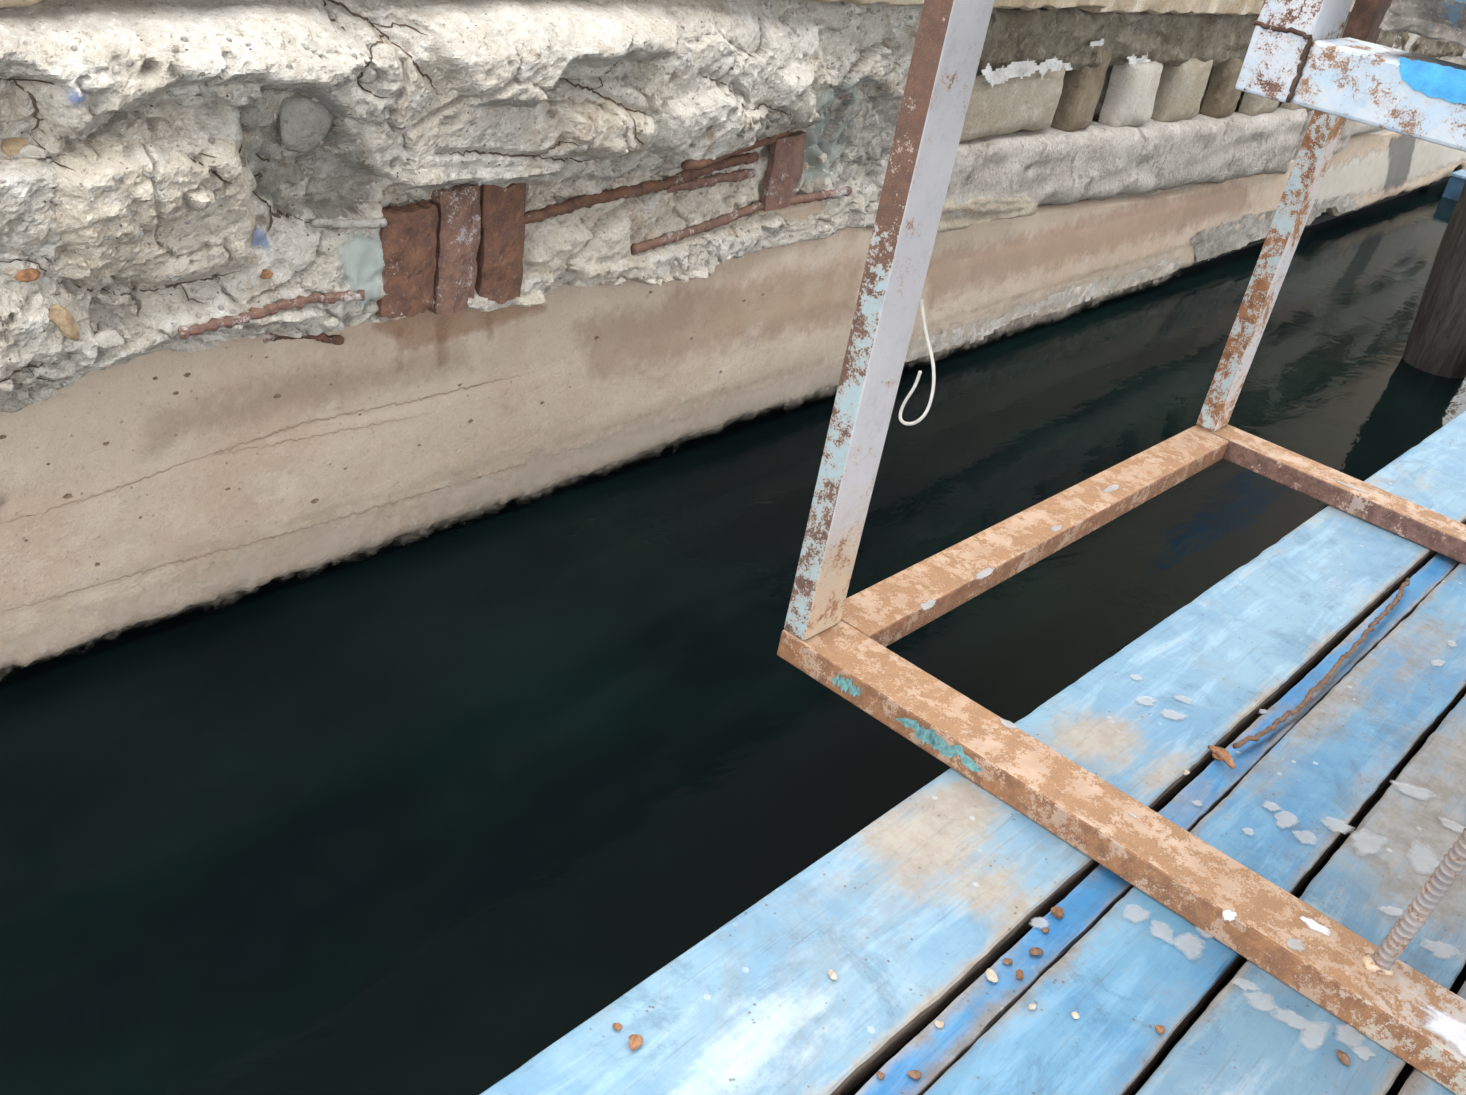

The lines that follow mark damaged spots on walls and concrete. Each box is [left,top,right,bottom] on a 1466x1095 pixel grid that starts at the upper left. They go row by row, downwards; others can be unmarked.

crack [323,0,439,98]
spalling [1092,65,1114,122]
spalling [0,0,923,365]
spalling [905,209,1277,362]
spalling [1305,193,1361,226]
spalling [0,372,89,413]
crack [4,369,542,523]
crack [1,403,733,613]